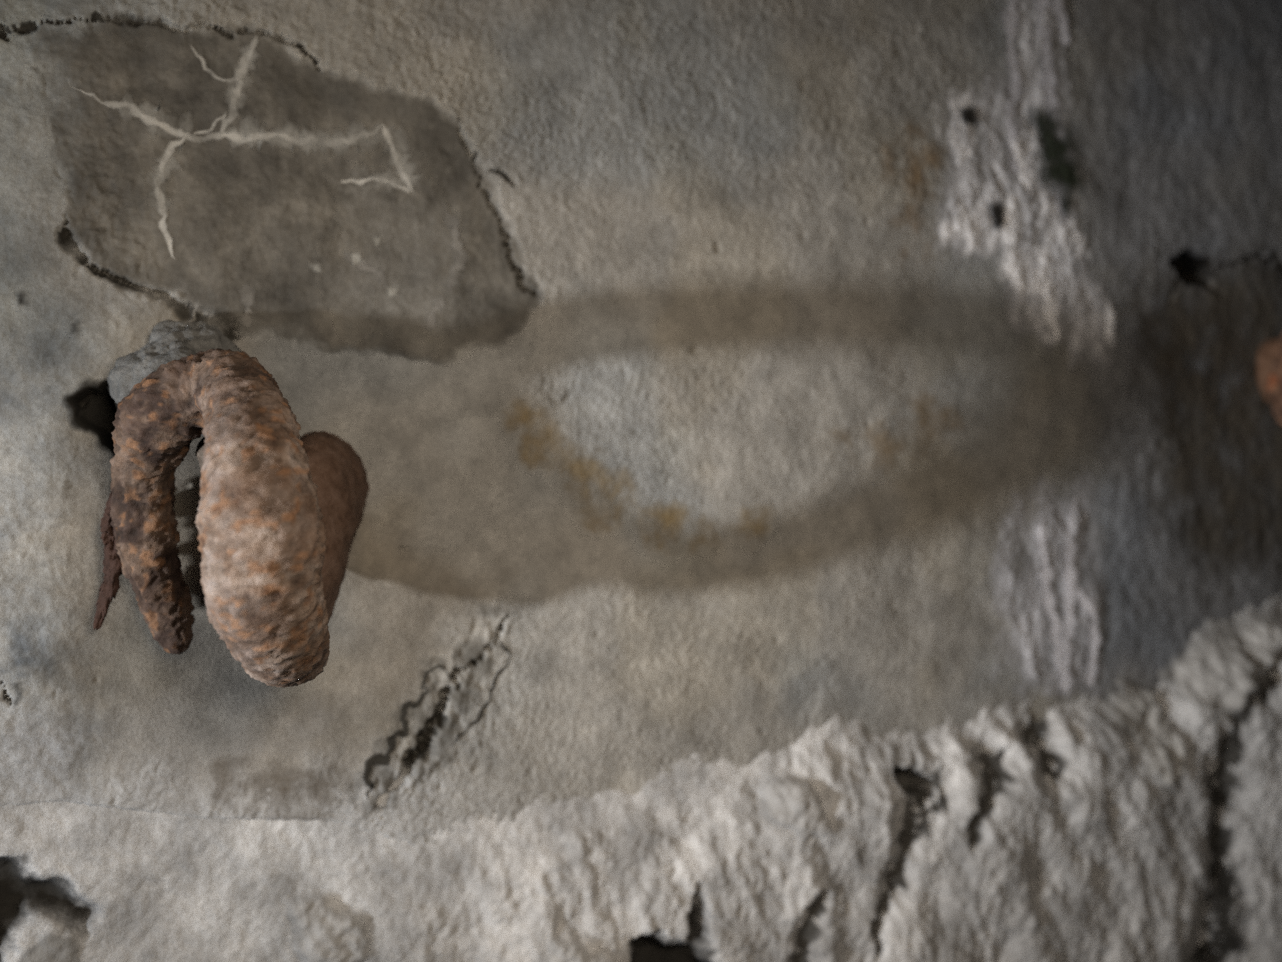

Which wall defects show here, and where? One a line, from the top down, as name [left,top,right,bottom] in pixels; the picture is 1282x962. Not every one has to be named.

spalling [42,14,538,361]
corrosion [93,492,123,630]
crack [363,609,517,809]